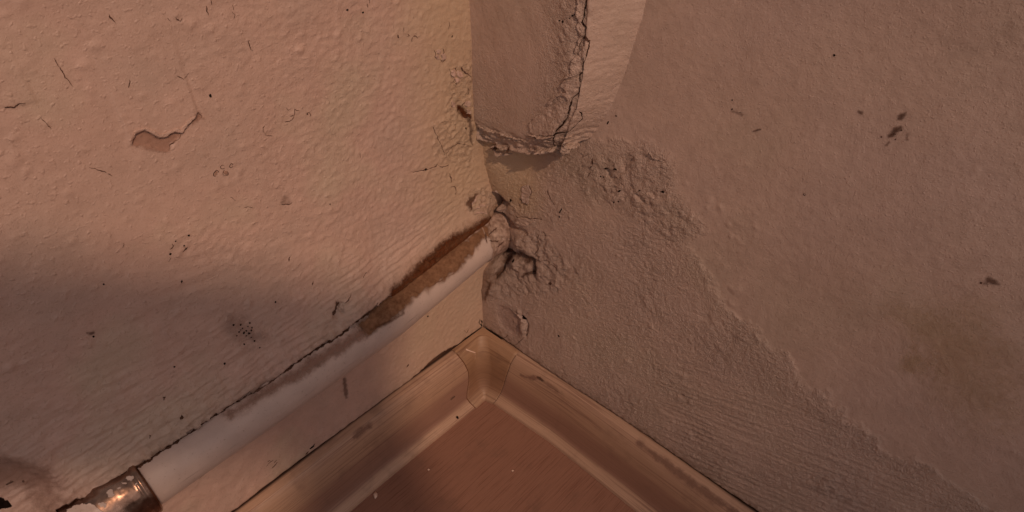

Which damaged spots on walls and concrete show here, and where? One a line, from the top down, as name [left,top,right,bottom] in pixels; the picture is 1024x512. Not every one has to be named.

peeling [132,112,202,152]
peeling [478,0,587,157]
crack [553,0,590,150]